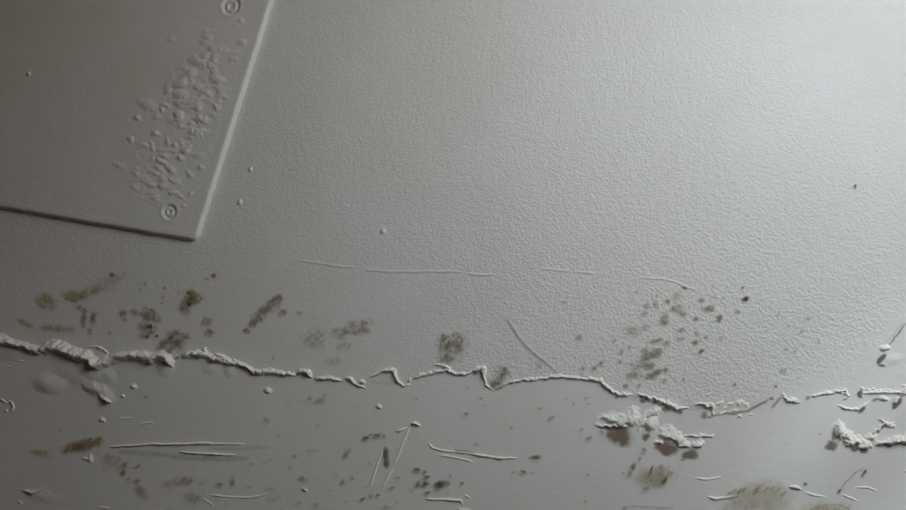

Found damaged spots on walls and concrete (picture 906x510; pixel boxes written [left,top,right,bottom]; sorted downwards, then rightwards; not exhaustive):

water stain [142,309,180,352]
water stain [644,338,668,381]
peeling [877,344,904,368]
peeling [595,405,714,459]
peeling [826,418,906,453]